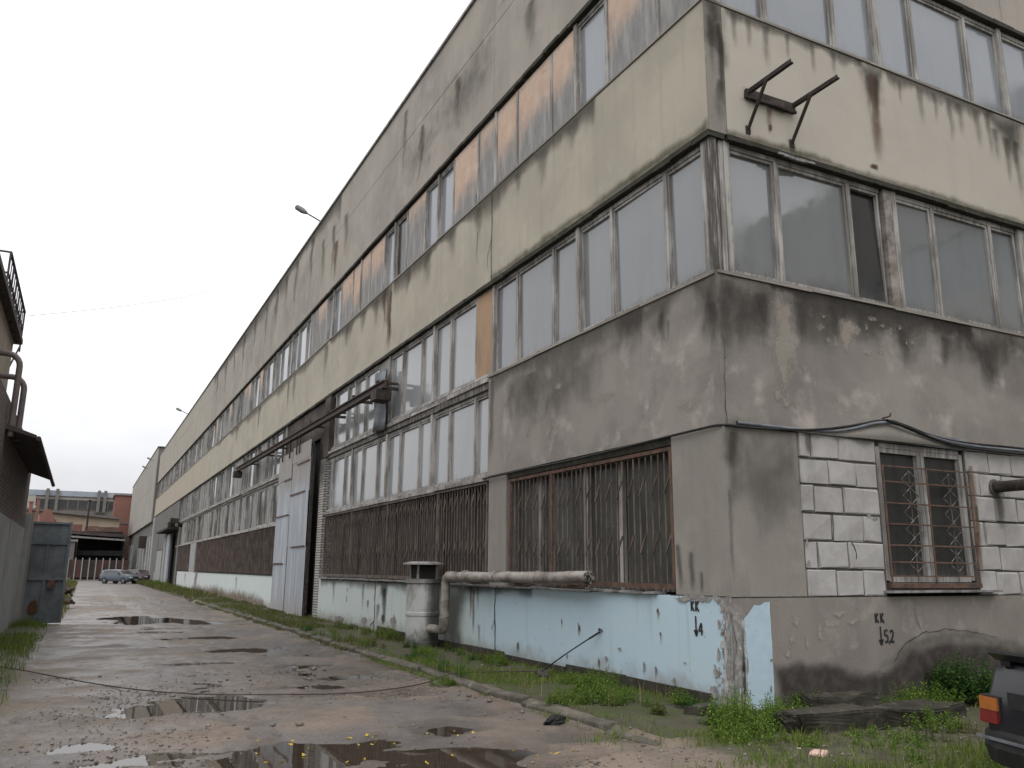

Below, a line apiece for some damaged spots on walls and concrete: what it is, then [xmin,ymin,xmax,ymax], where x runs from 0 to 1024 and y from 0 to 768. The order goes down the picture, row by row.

leakage [868,71,1016,147]
leakage [215,98,594,445]
leakage [492,308,640,393]
peeling [676,594,749,710]
leakage [778,644,1024,708]
crack [894,606,993,662]